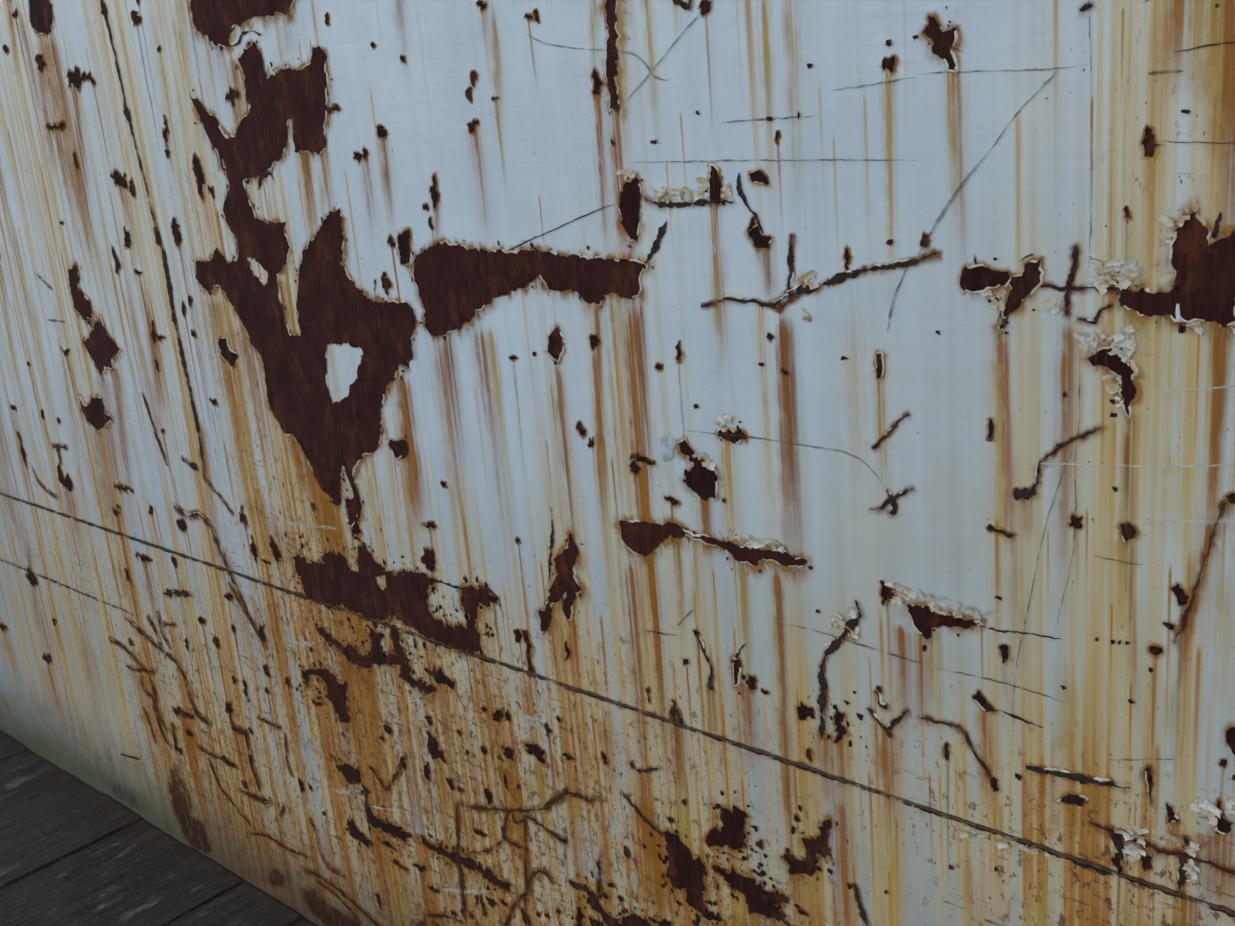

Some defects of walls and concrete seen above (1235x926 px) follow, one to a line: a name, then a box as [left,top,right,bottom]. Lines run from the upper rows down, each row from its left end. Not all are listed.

corrosion [465,70,480,164]
corrosion [591,67,615,196]
peeling [68,262,123,440]
peeling [189,0,813,896]
corrosion [576,334,601,475]
peeling [1077,201,1235,505]
corrosion [421,521,438,573]
peeling [885,581,1060,682]
corrosion [369,629,583,926]
peeling [559,790,853,926]
corrosion [1089,820,1235,926]
peeling [1166,797,1235,886]